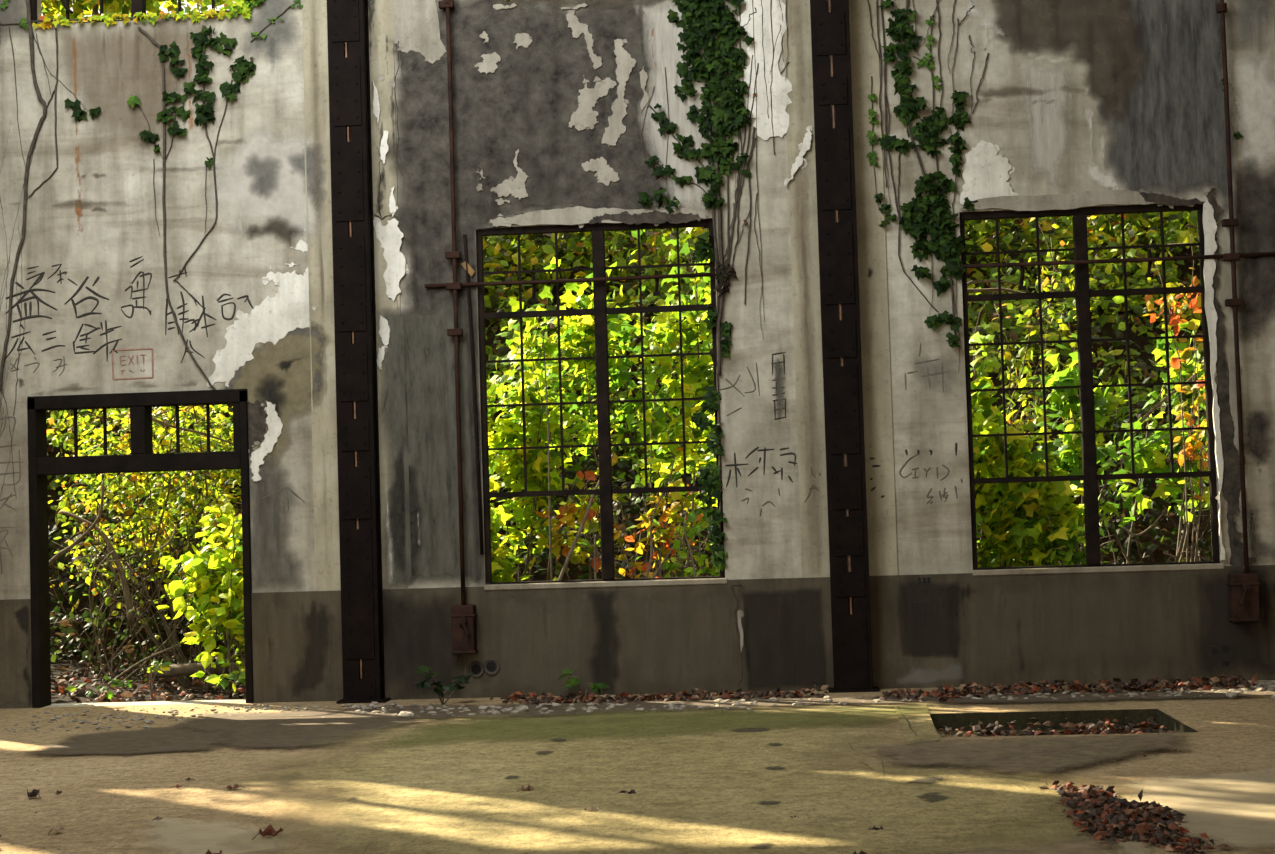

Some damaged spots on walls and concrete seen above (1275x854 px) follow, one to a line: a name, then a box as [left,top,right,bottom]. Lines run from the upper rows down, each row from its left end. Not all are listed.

flaking render [392,0,447,64]
flaking render [475,31,501,75]
flaking render [513,33,533,49]
flaking render [369,59,395,164]
flaking render [561,3,650,186]
flaking render [476,149,529,227]
spalling [589,210,704,226]
flaking render [784,126,812,188]
damp [968,0,1275,336]
flaking render [207,239,316,387]
flaking render [247,400,283,482]
damp [1246,413,1269,461]